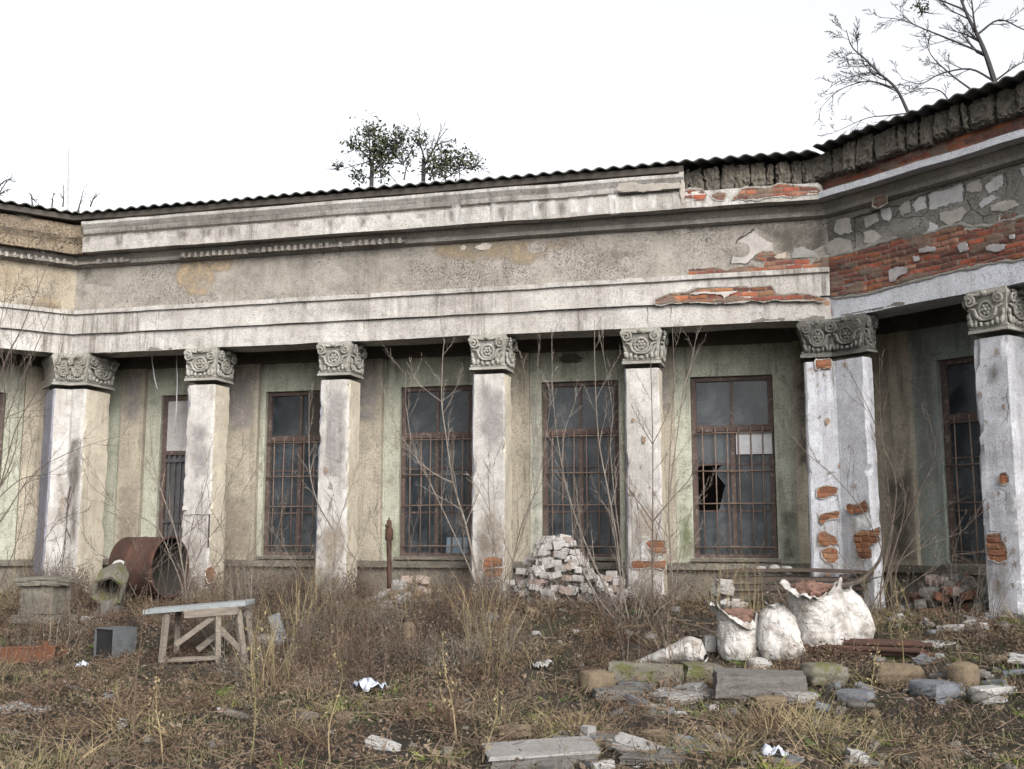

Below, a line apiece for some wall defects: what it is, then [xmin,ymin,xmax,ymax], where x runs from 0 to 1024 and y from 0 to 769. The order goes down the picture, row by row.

spalling [616,113,1024,204]
spalling [653,175,1024,320]
spalling [814,358,846,386]
peeling [481,514,503,578]
spalling [630,539,668,588]
spalling [816,460,881,577]
spalling [986,532,1016,588]